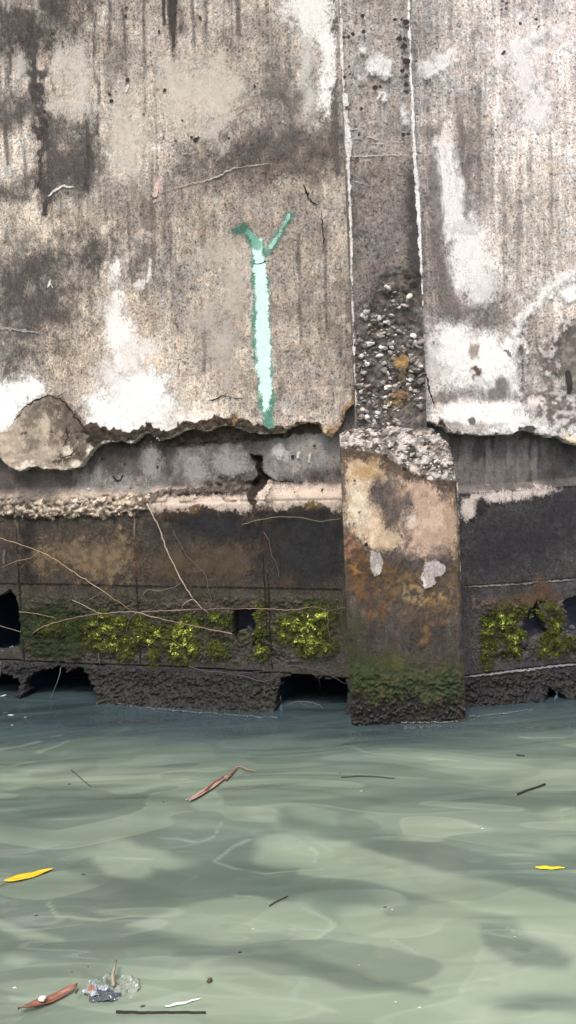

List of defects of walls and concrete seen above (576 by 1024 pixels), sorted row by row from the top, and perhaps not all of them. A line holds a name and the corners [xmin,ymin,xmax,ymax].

damp [0,0,576,440]
spalling [0,462,253,520]
damp [0,232,343,589]
crack [165,453,302,527]
spalling [81,279,459,589]
rust [344,523,452,623]